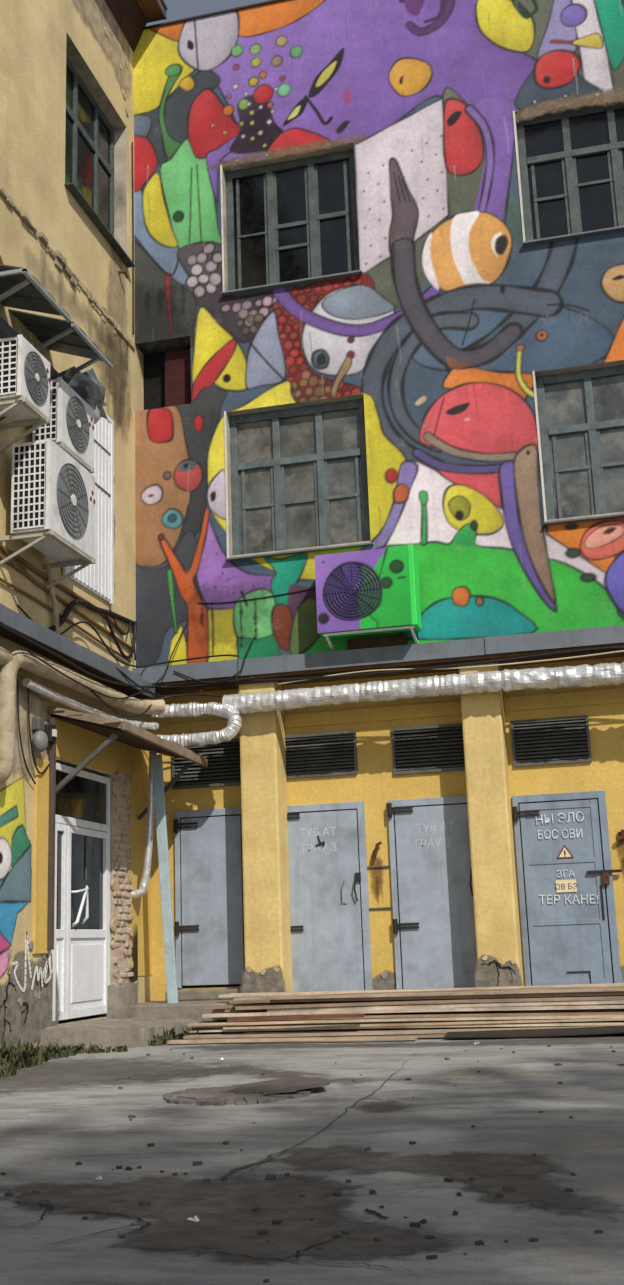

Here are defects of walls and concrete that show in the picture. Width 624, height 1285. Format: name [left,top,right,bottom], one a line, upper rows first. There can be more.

rust [372,859,382,898]
spalling [241,966,286,993]
spalling [475,955,523,987]
water stain [0,1145,616,1263]